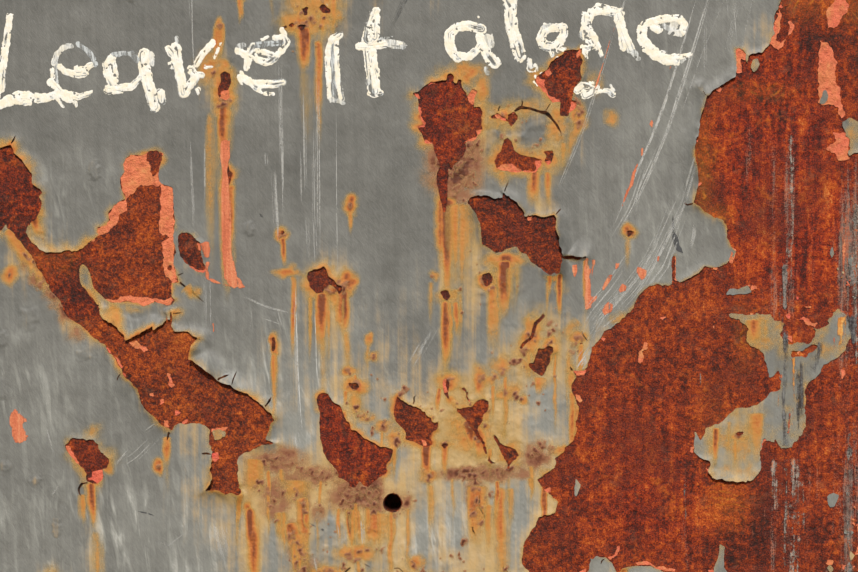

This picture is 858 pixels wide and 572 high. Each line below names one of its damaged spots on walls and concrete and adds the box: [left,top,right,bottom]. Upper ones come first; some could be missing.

corrosion [282,0,342,122]
corrosion [200,18,235,272]
peeling [410,73,518,212]
peeling [487,138,558,174]
peeling [0,135,284,510]
corrosion [275,228,359,353]
corrosion [427,138,484,362]
peeling [462,187,597,282]
peeling [518,0,858,572]
corrosion [236,446,425,572]
peeling [315,390,452,487]
corrosion [420,317,587,572]